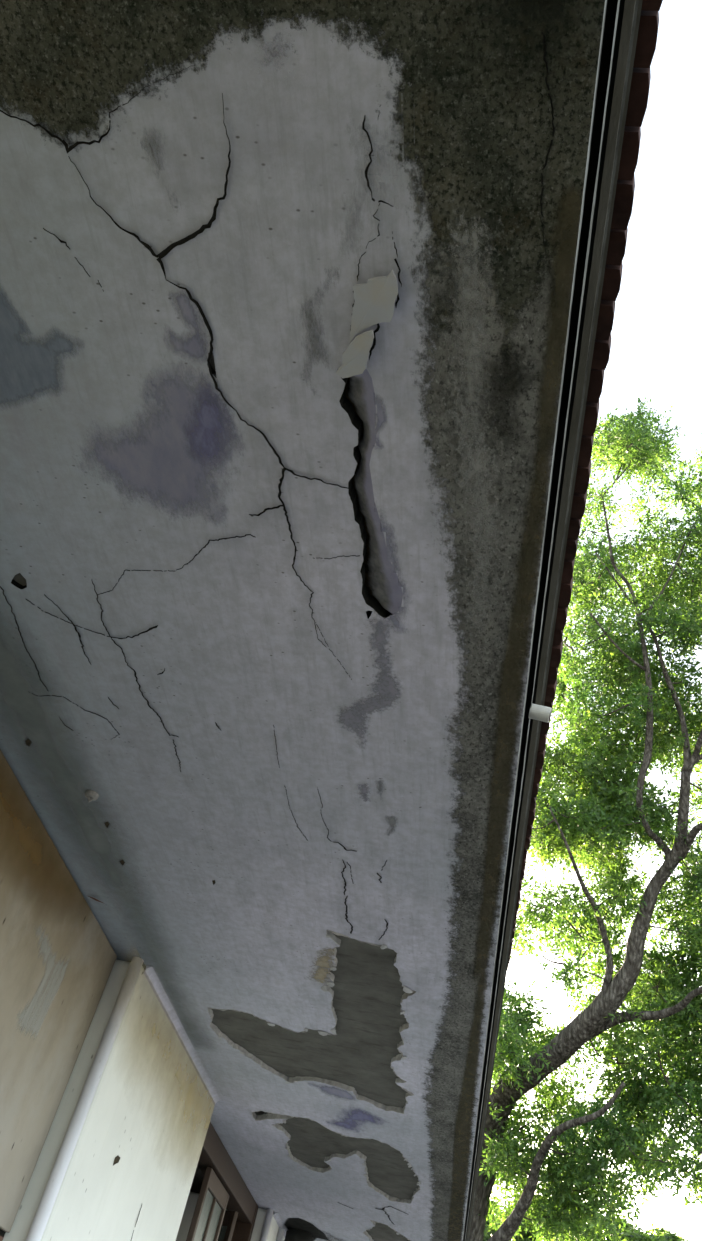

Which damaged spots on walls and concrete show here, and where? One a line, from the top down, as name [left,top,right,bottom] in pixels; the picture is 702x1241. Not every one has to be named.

crack [350,105,402,360]
crack [0,63,360,771]
leakage [0,629,140,913]
leakage [339,621,400,744]
spalling [207,930,416,1114]
spalling [271,1116,421,1204]
spalling [363,1220,411,1241]